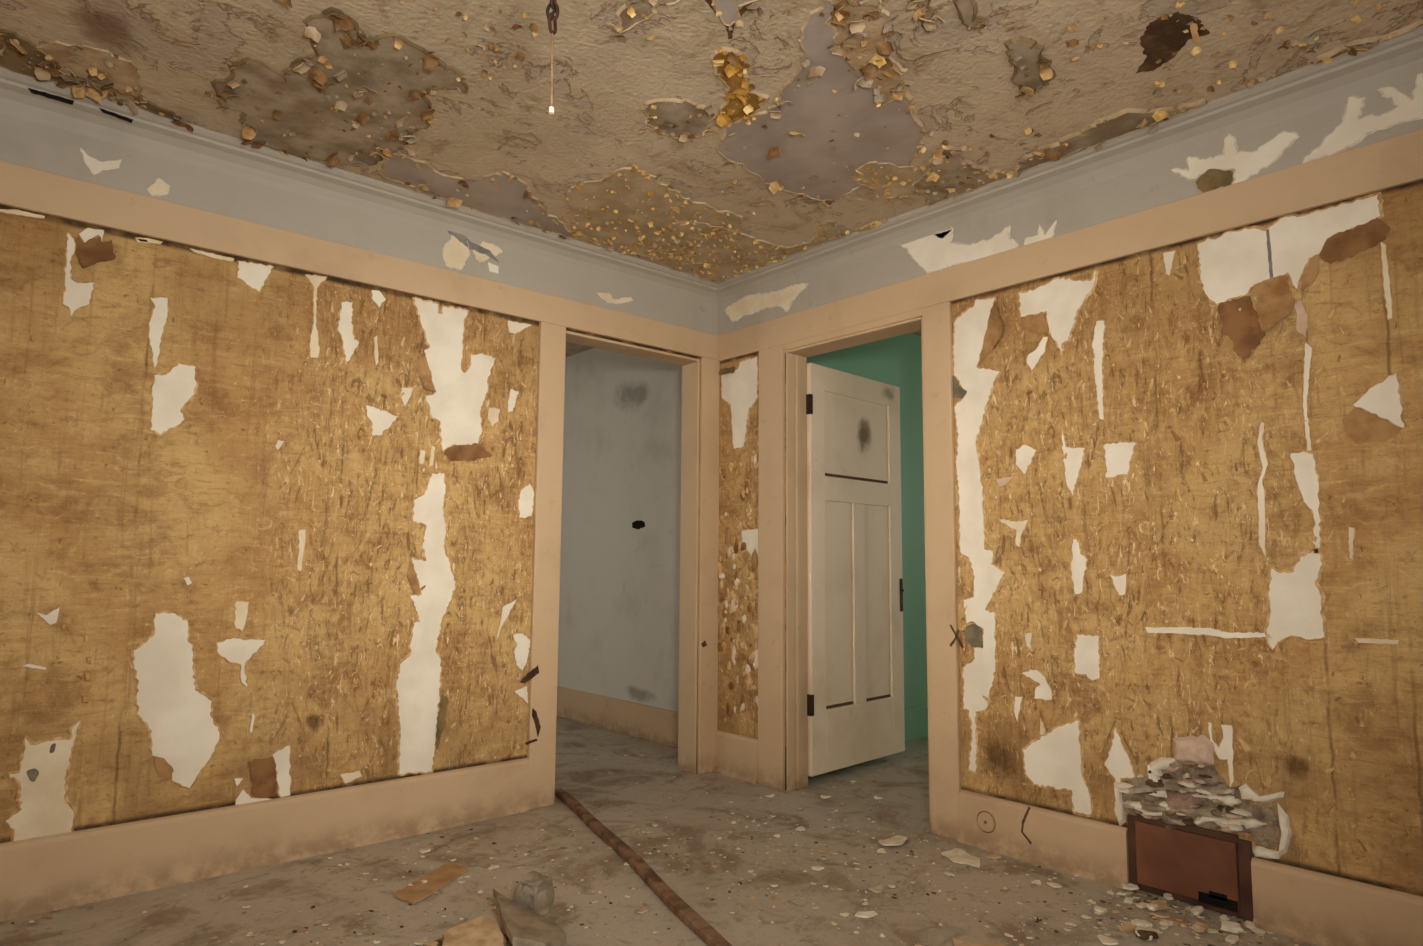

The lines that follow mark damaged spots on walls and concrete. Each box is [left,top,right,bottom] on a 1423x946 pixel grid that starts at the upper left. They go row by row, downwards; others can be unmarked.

peeling [205,0,1423,283]
peeling [61,227,116,318]
peeling [148,296,199,437]
peeling [719,356,759,449]
peeling [1017,268,1099,371]
peeling [1195,192,1393,359]
peeling [393,296,497,776]
peeling [950,296,1095,817]
peeling [1256,342,1327,651]
peeling [4,718,82,842]
peeling [129,610,222,790]
flaking render [1104,721,1292,859]